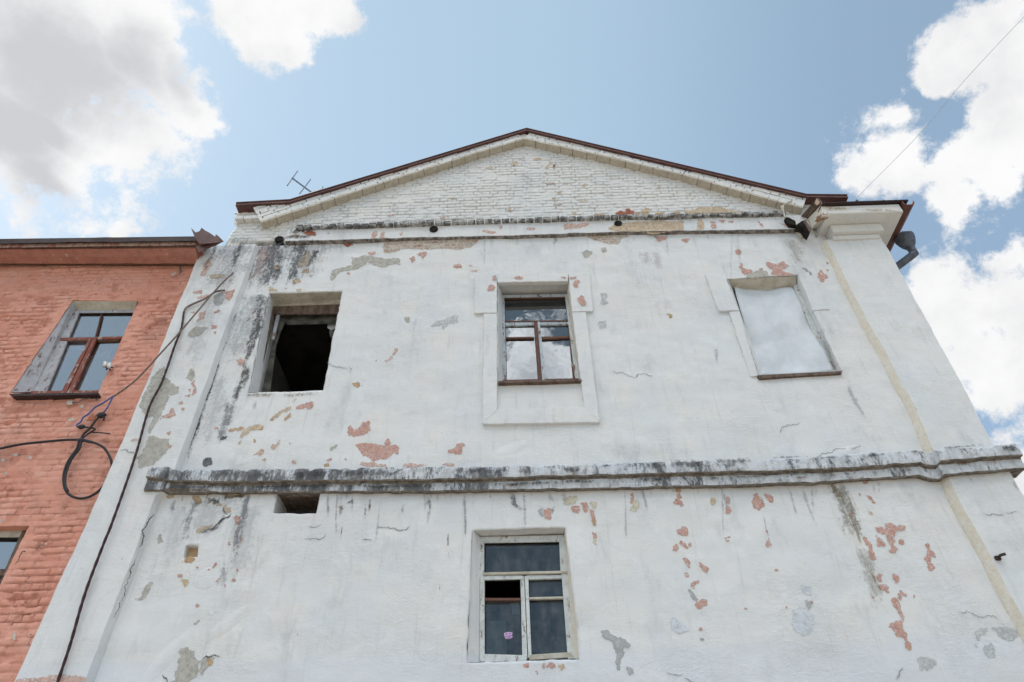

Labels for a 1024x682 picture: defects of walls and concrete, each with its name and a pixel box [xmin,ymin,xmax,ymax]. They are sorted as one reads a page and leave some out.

flaking render [330,225,503,280]
peeling [735,249,829,282]
peeling [131,367,196,469]
peeling [347,421,426,468]
leakage [340,469,431,488]
leakage [509,467,592,485]
leakage [640,460,700,480]
leakage [833,488,860,535]
crack [114,514,154,617]
peeling [673,526,709,609]
peeling [872,573,937,671]
flaking render [171,647,214,682]